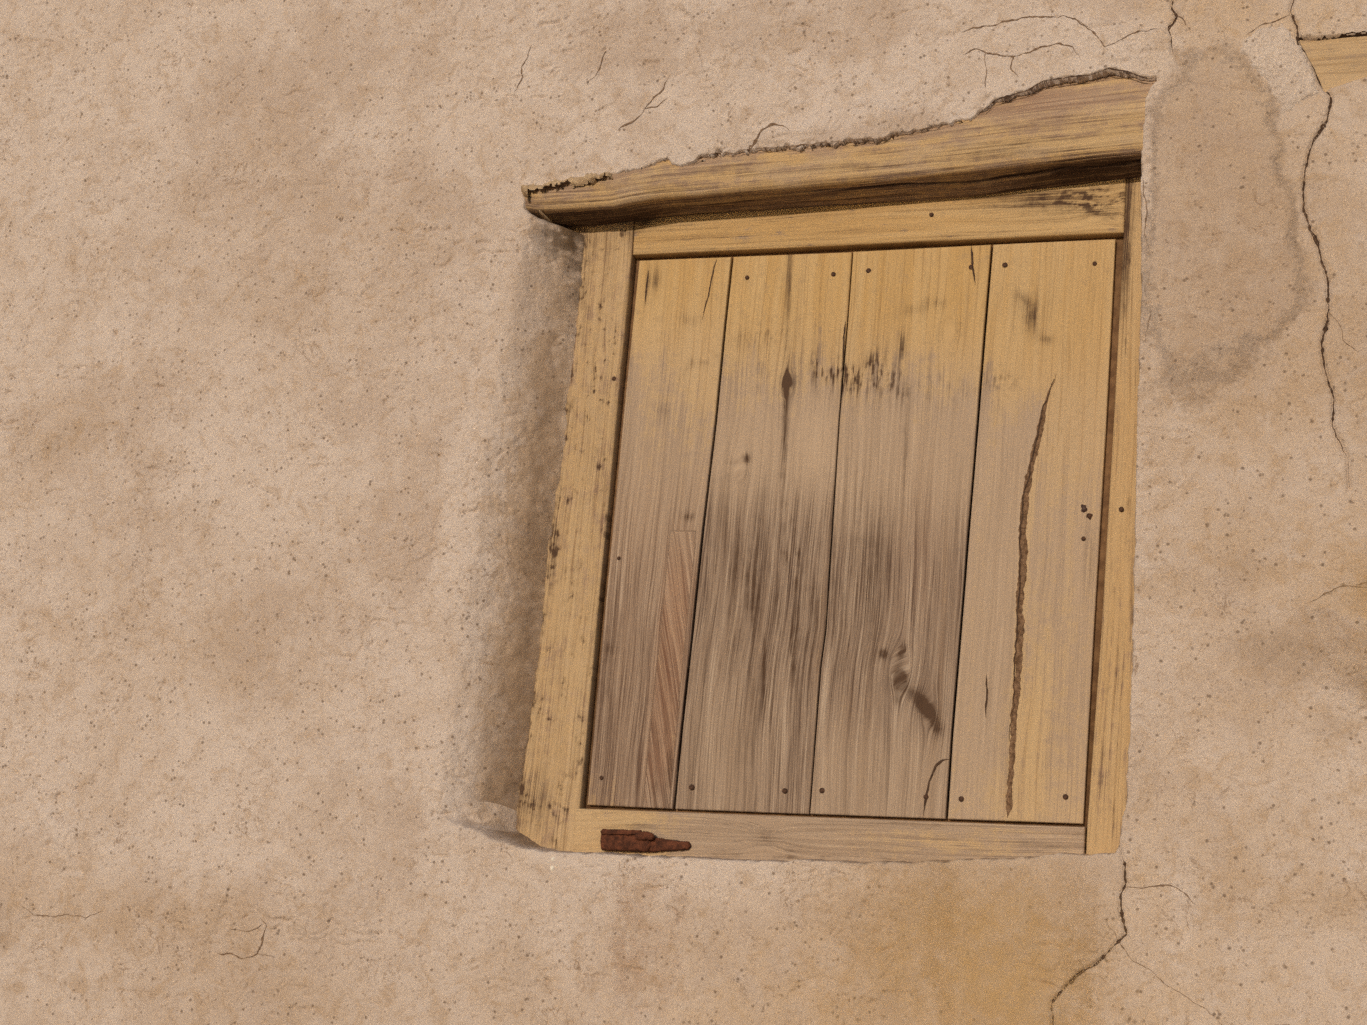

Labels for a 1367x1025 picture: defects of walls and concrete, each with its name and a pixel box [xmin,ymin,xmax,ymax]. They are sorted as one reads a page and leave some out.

crack [686,1,1186,164]
spalling [521,172,613,223]
crack [1248,0,1367,487]
crack [1050,851,1223,1025]